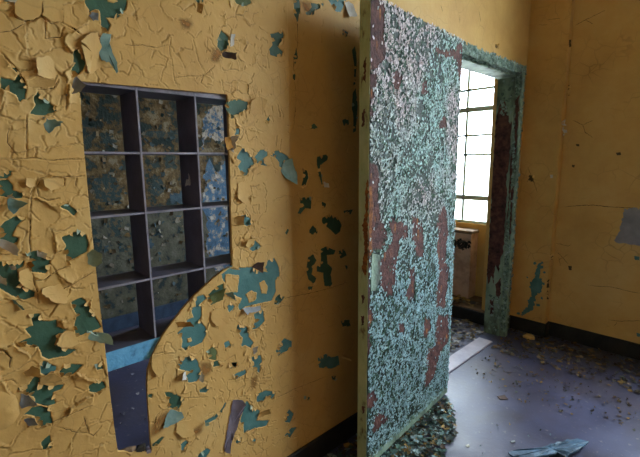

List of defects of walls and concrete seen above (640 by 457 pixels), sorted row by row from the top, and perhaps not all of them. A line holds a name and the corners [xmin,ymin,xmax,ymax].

crack [0,15,79,39]
crack [7,115,79,251]
peeling [0,169,114,430]
peeling [66,0,129,208]
peeling [175,258,284,393]
peeling [196,99,308,257]
corrosion [361,0,386,127]
corrosion [361,163,424,356]
corrosion [422,204,449,387]
corrosion [436,42,463,81]
peeling [367,0,546,457]
corrosion [487,95,520,314]